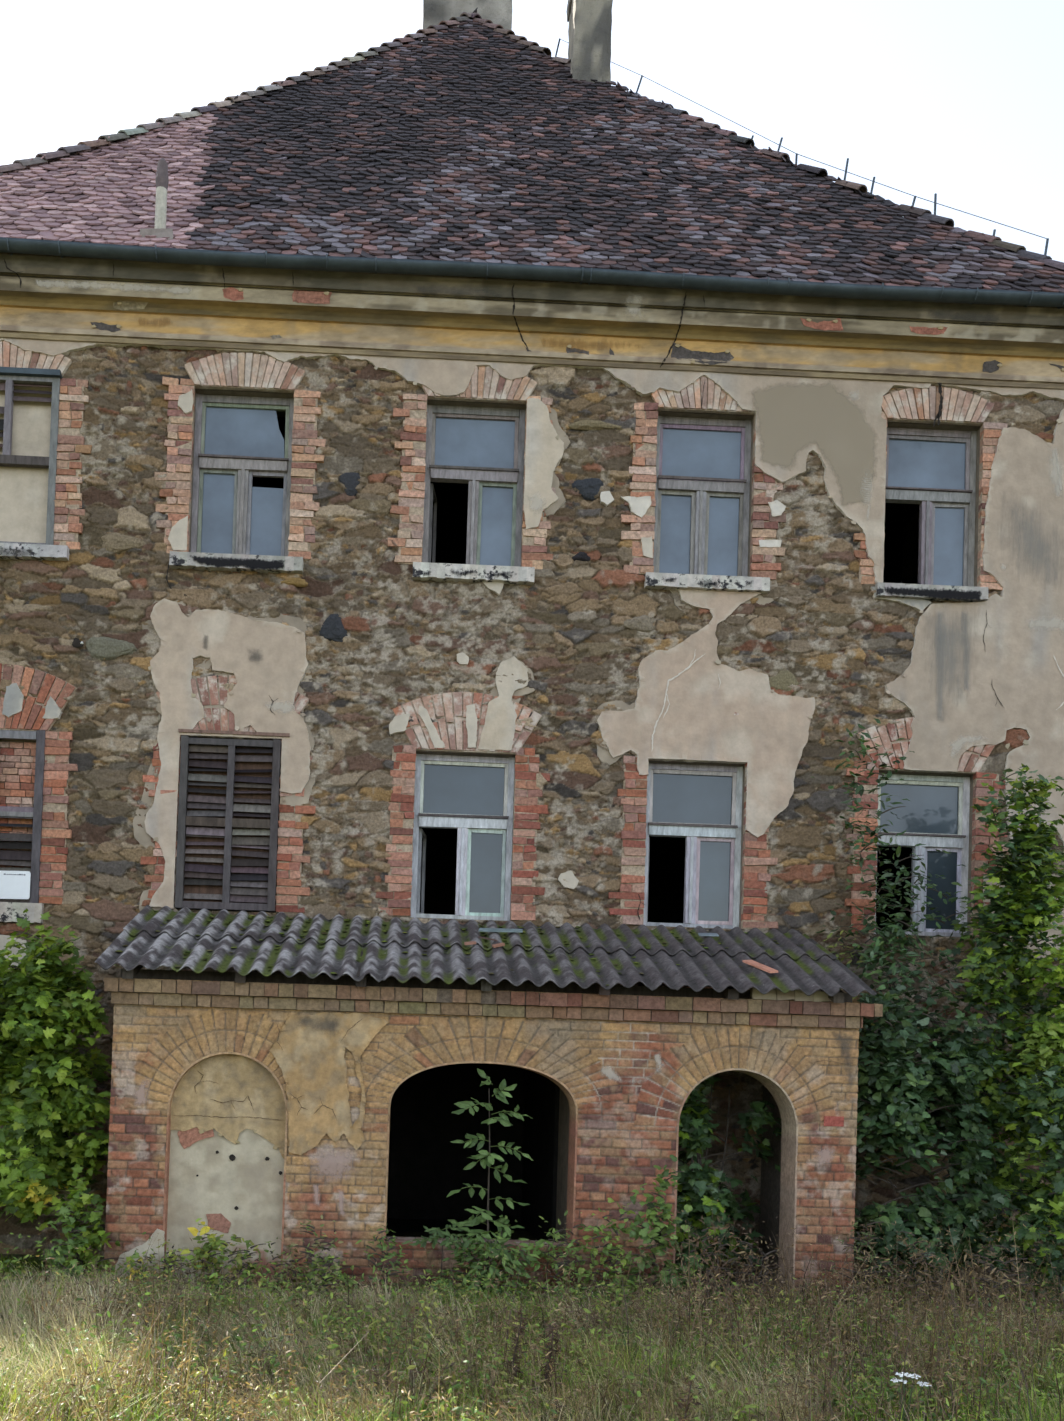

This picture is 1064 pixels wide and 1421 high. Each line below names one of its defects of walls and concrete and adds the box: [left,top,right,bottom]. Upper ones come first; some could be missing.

crack [511,285,528,349]
crack [660,291,705,367]
spalling [0,322,1064,1137]
spalling [0,1155,108,1256]
spalling [206,1206,239,1233]
peeling [170,1012,388,1175]
spalling [678,1071,763,1271]
spalling [853,1089,1061,1283]